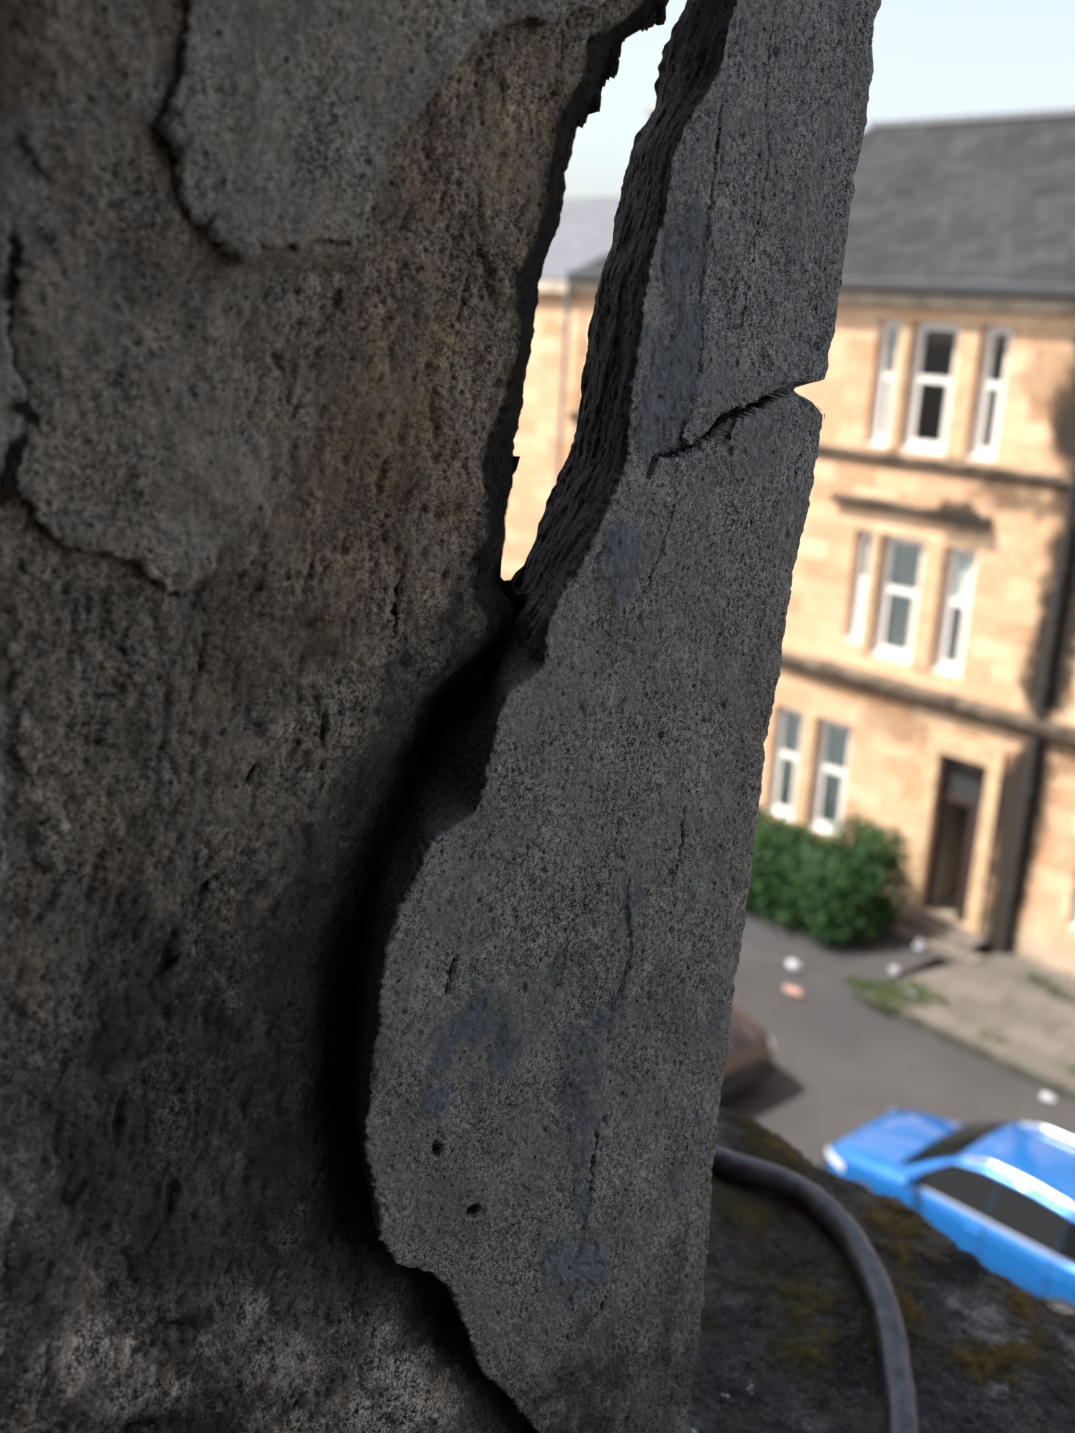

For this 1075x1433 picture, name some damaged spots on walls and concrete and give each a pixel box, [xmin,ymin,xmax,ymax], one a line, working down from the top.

crack [698,128,722,371]
crack [657,396,774,458]
flaking render [0,0,615,1069]
crack [390,562,403,633]
water stain [1017,365,1075,718]
crack [445,958,455,993]
crack [606,879,632,1042]
crack [580,1133,598,1230]